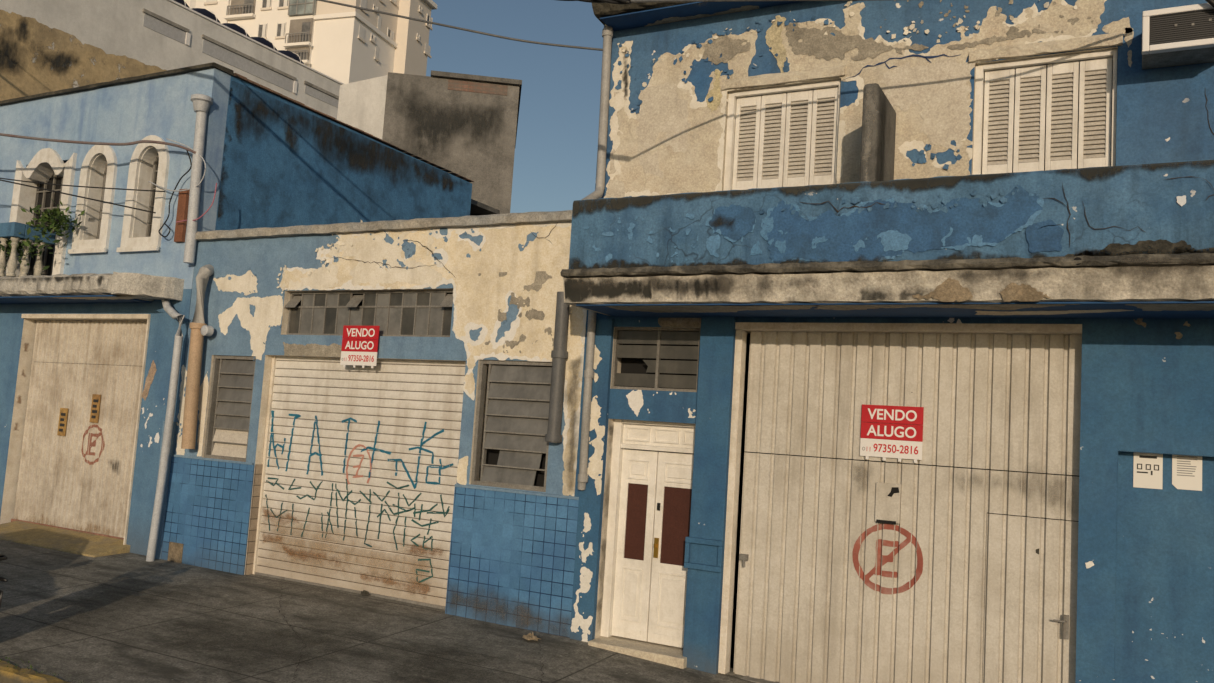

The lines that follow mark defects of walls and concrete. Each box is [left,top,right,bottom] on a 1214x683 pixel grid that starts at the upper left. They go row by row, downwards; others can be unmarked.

water stain [0,10,167,101]
water stain [224,87,495,190]
peeling [213,0,1214,496]
crack [801,201,882,212]
crack [1041,183,1145,248]
peeling [571,513,594,642]